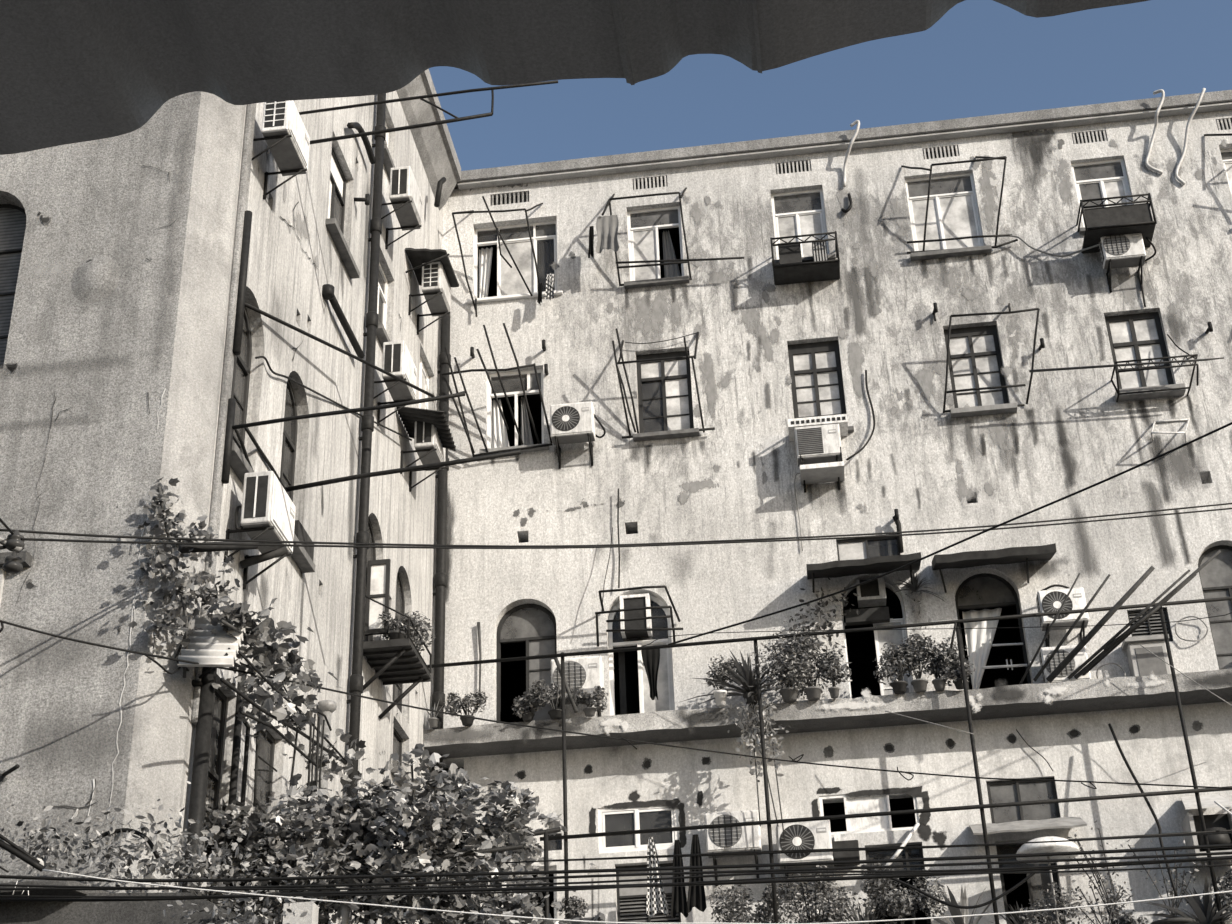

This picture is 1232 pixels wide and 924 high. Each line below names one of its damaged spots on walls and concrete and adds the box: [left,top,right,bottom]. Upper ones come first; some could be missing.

leakage [1016,136,1049,176]
leakage [921,259,946,275]
leakage [968,254,1008,279]
leakage [838,267,879,334]
leakage [1167,315,1185,342]
leakage [1168,395,1196,425]
leakage [1056,409,1075,486]
leakage [836,481,845,503]
leakage [1127,400,1201,564]
leakage [1075,509,1096,573]
crack [43,501,149,819]